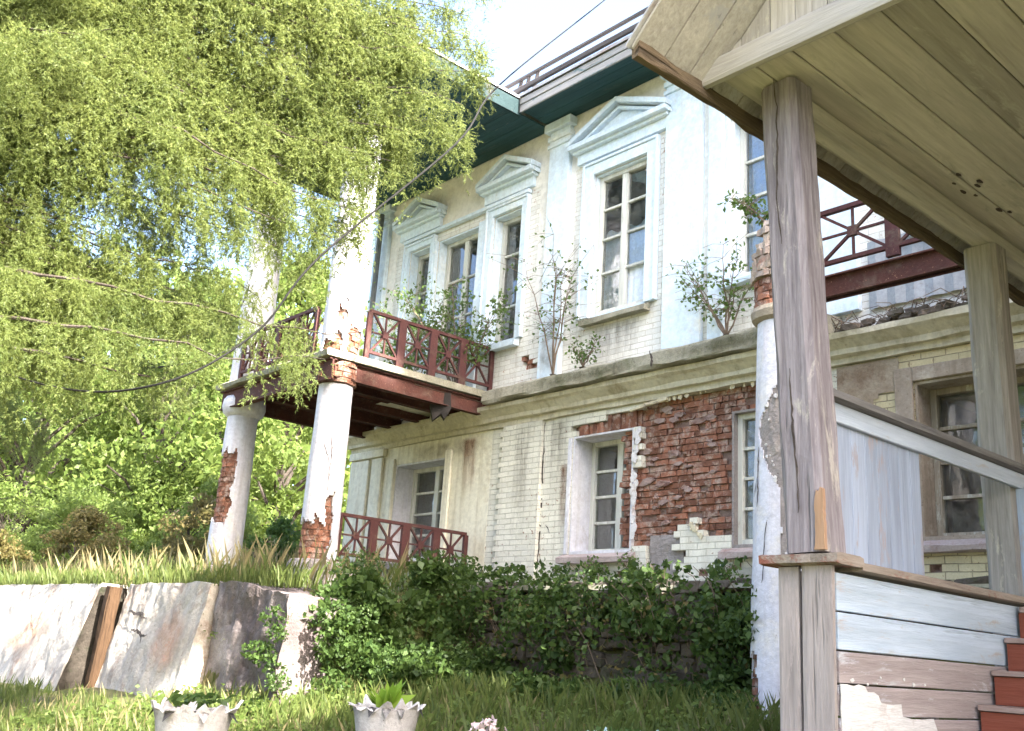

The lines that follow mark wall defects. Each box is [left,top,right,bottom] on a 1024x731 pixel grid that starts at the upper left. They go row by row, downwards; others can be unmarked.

crack [773,78,782,244]
flaking render [324,303,360,355]
flaking render [213,446,238,522]
flaking render [299,492,335,560]
crack [537,426,549,569]
flaking render [576,382,787,582]
peeling [840,677,937,731]